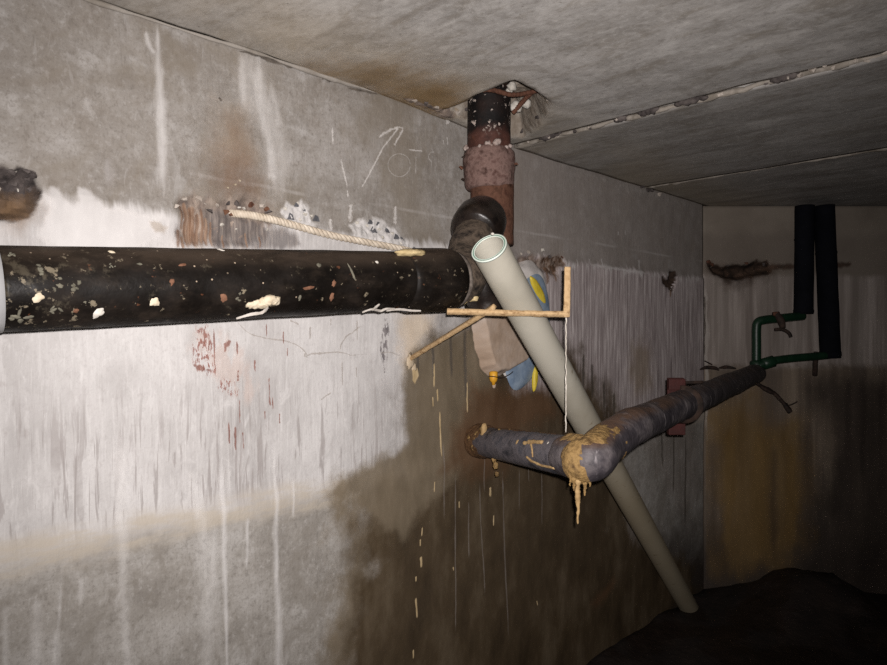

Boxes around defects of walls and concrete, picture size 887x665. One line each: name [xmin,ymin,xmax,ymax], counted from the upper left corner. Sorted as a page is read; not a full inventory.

peeling [0,166,165,247]
spalling [174,195,320,251]
flaking render [350,218,415,248]
corrosion [194,328,238,373]
leakage [327,325,675,665]
leakage [816,378,887,589]